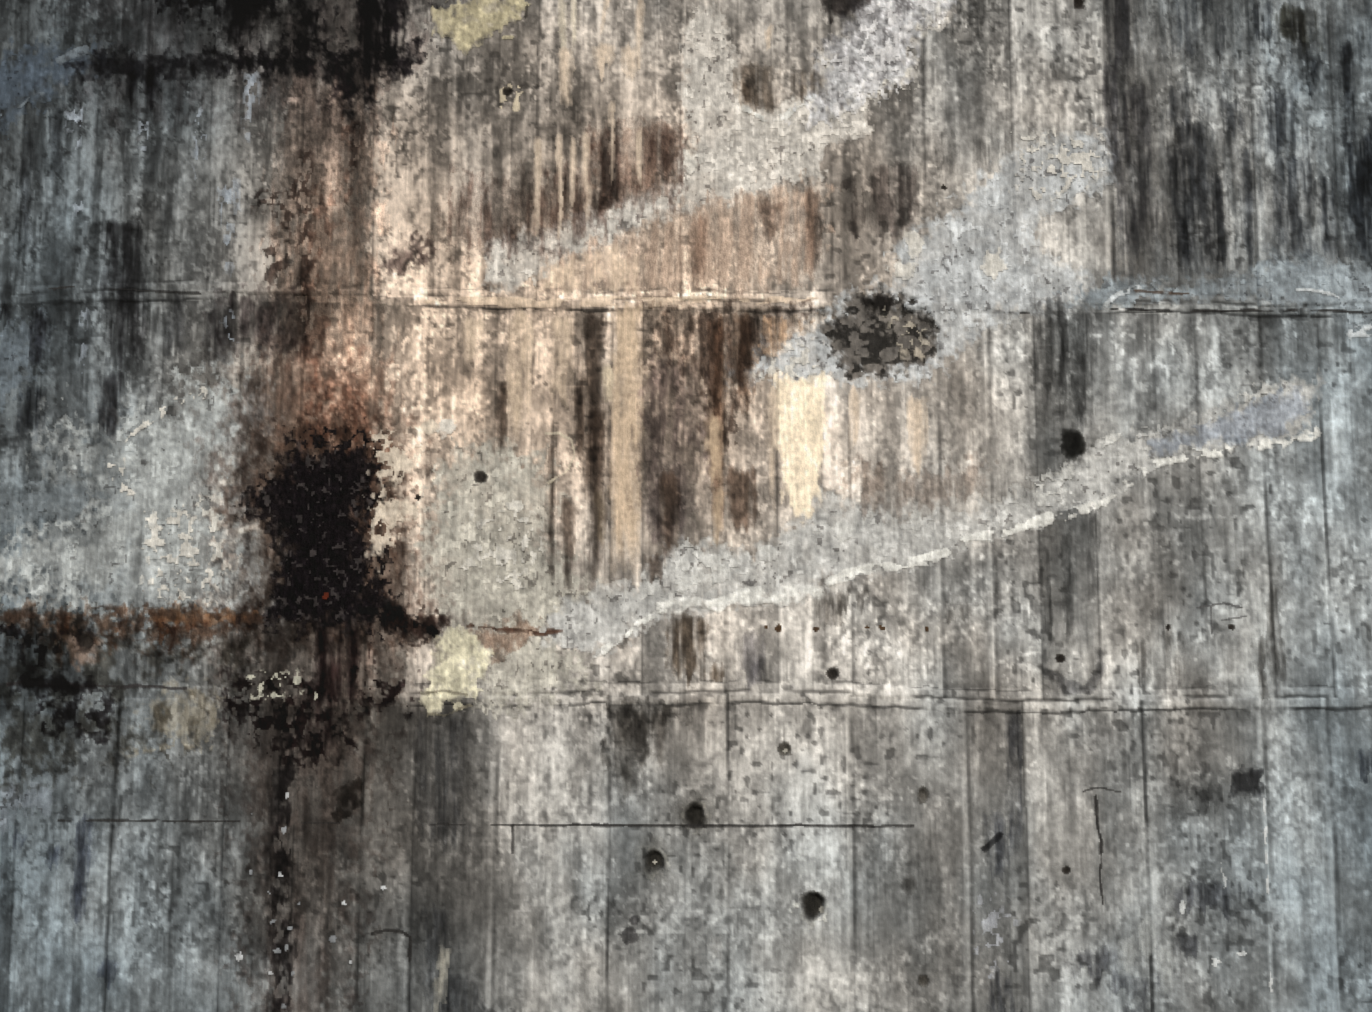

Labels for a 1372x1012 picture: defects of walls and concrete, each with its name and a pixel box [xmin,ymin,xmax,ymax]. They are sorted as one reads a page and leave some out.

leakage [555,0,646,110]
leakage [921,0,986,67]
leakage [529,100,616,242]
leakage [840,159,931,246]
spalling [756,119,1372,398]
leakage [1030,0,1372,462]
leakage [456,244,999,593]
leakage [0,0,481,1012]
rust [0,590,265,654]
rust [358,592,563,666]
leakage [1036,511,1102,650]
leakage [418,902,516,1012]